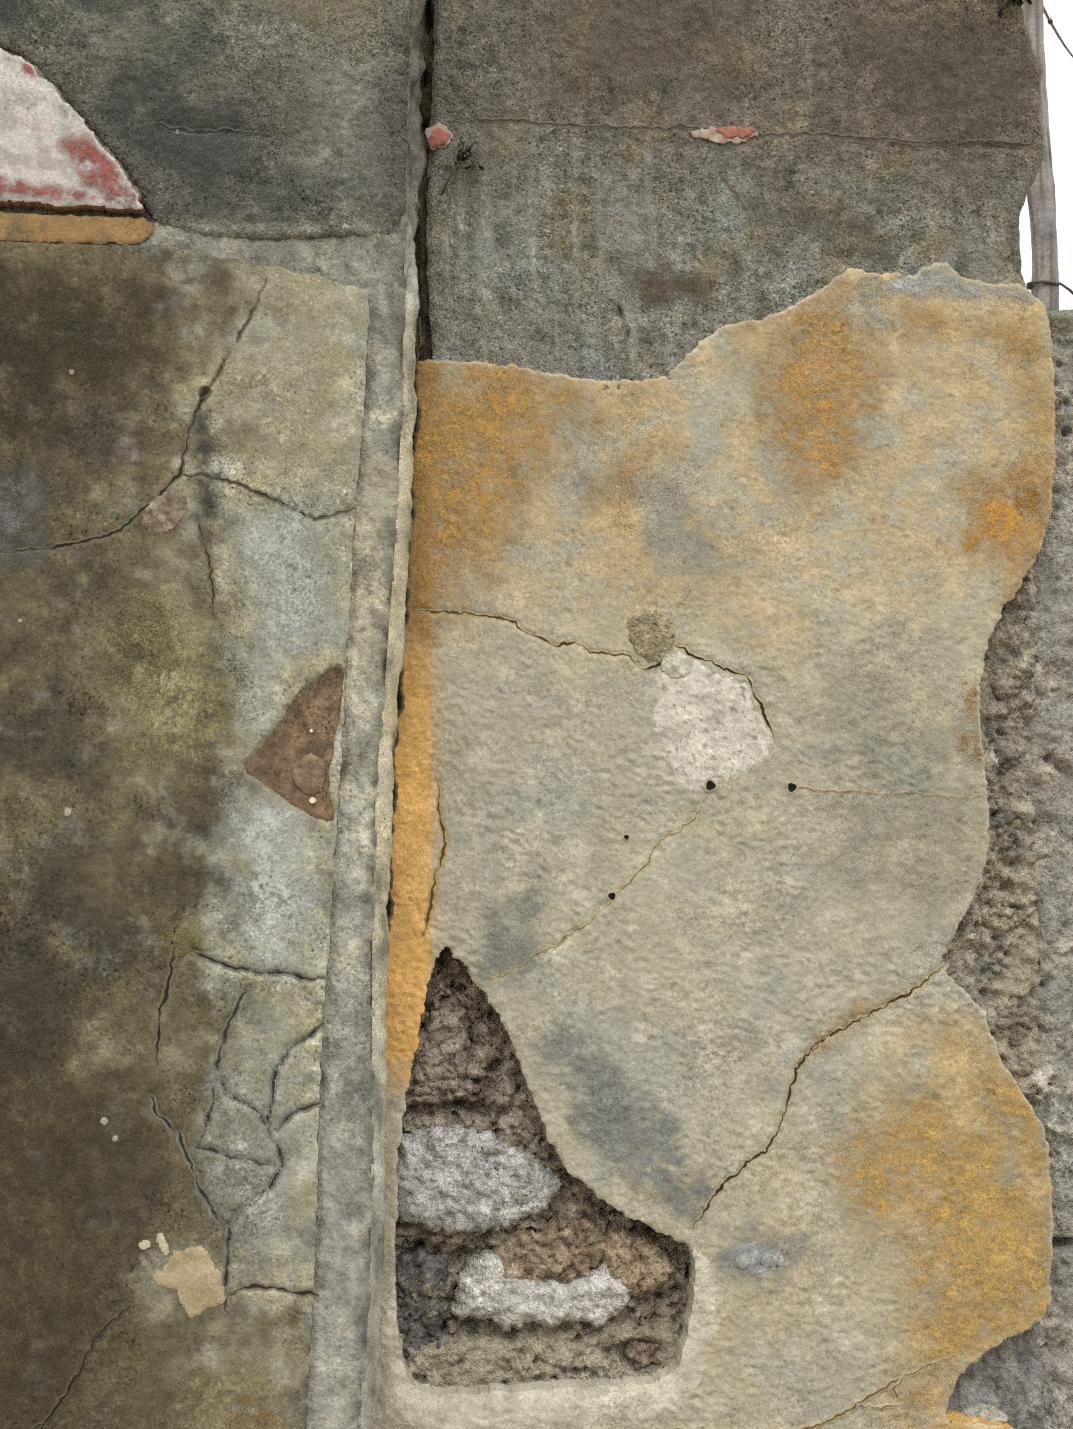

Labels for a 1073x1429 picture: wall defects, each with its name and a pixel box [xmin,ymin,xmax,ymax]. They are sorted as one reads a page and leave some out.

crack [448,117,1035,151]
crack [0,278,354,554]
crack [196,516,217,621]
crack [405,317,776,742]
crack [386,667,449,937]
crack [487,794,709,983]
spalling [652,651,774,791]
crack [149,921,326,1315]
spalling [380,947,718,1429]
crack [690,961,949,1232]